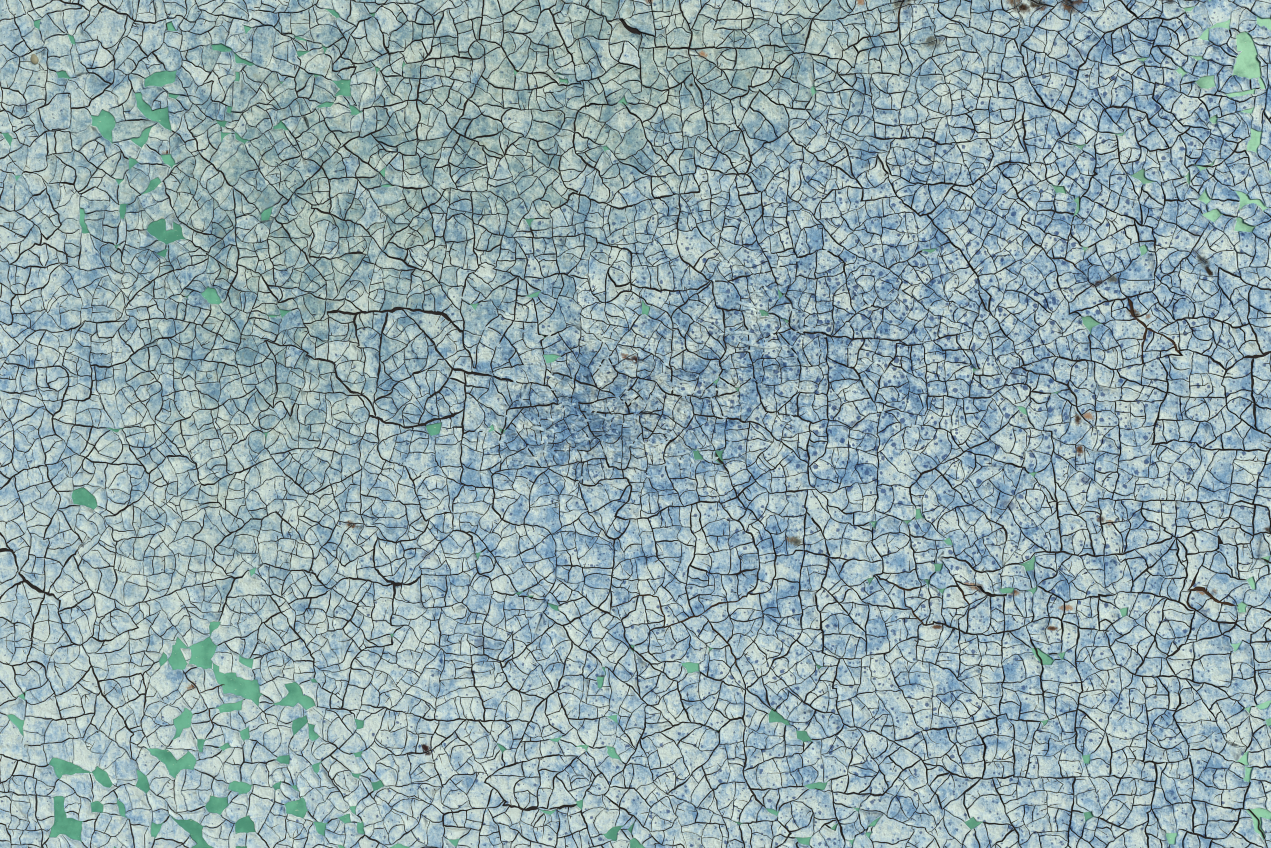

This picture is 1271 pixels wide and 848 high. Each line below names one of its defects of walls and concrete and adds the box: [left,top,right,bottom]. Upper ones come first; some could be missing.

crack [1,0,309,109]
peeling [15,0,380,271]
peeling [1058,0,1271,268]
peeling [1119,242,1156,280]
peeling [185,271,236,320]
peeling [1249,286,1271,313]
peeling [1062,306,1109,343]
crack [106,0,1085,848]
peeling [0,553,427,848]
crack [0,759,51,790]
peeling [443,826,480,848]